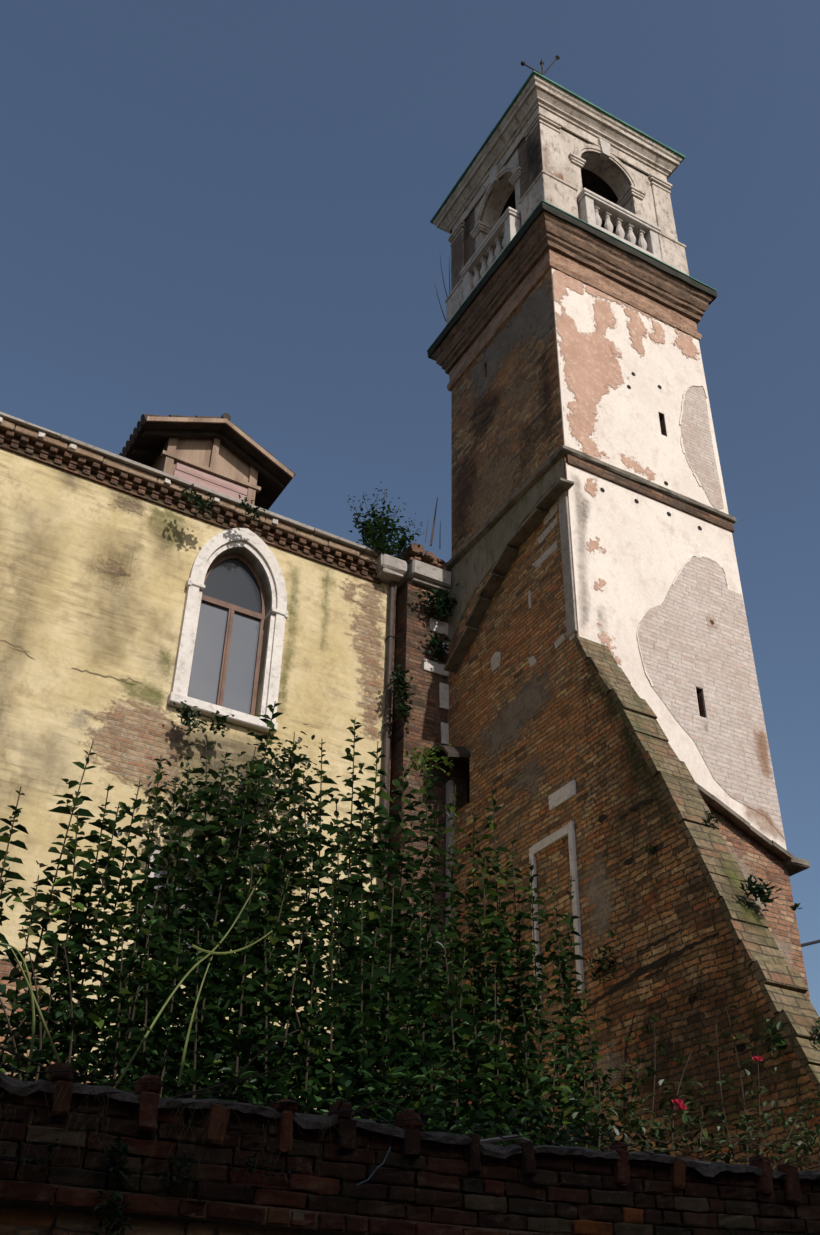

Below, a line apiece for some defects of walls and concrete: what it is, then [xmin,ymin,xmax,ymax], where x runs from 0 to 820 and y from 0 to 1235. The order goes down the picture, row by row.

flaking render [471,270,700,485]
peeling [447,457,565,649]
flaking render [584,478,605,497]
flaking render [585,537,607,554]
flaking render [679,384,724,509]
flaking render [79,695,193,798]
damp [186,738,257,815]
flaking render [341,578,387,740]
flaking render [490,651,501,672]
flaking render [636,555,785,839]